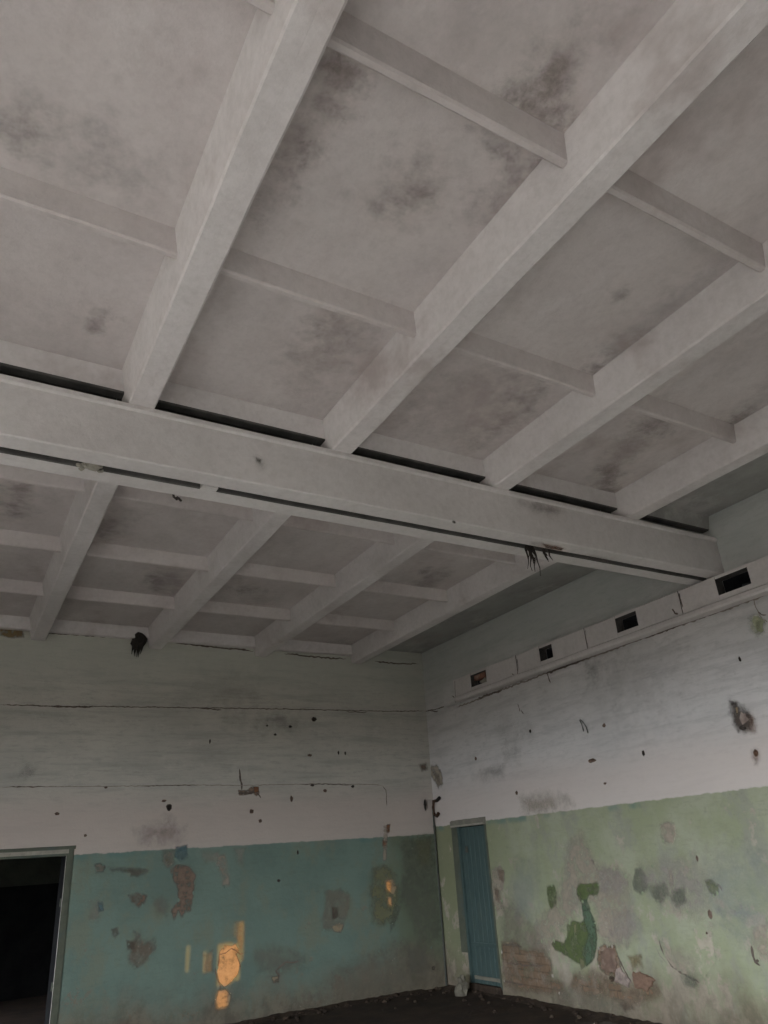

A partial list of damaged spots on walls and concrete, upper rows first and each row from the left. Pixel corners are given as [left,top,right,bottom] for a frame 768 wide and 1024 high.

crack [1,593,767,714]
crack [3,783,387,804]
peeling [164,845,196,918]
spalling [501,883,656,995]